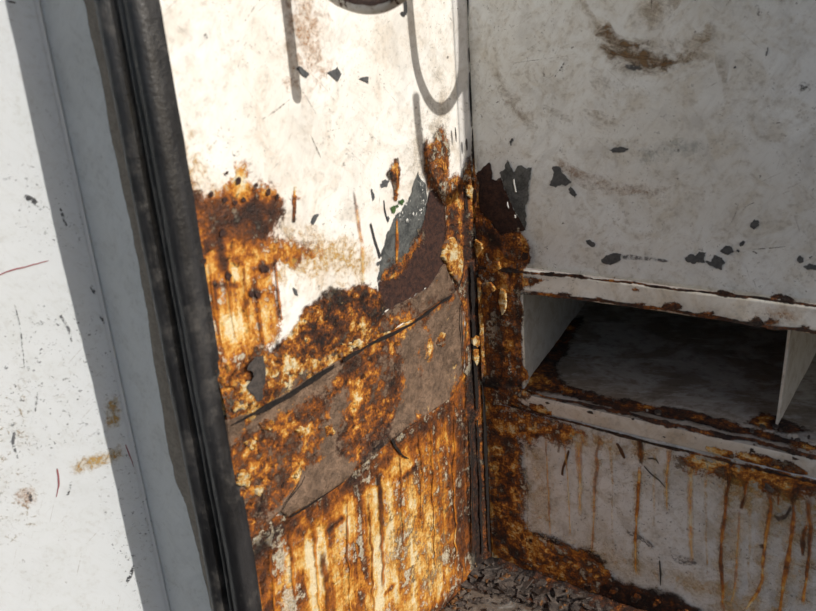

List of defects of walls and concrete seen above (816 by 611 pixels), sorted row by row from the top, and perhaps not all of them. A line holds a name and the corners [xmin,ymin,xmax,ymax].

corrosion [192,161,397,430]
corrosion [251,126,816,611]